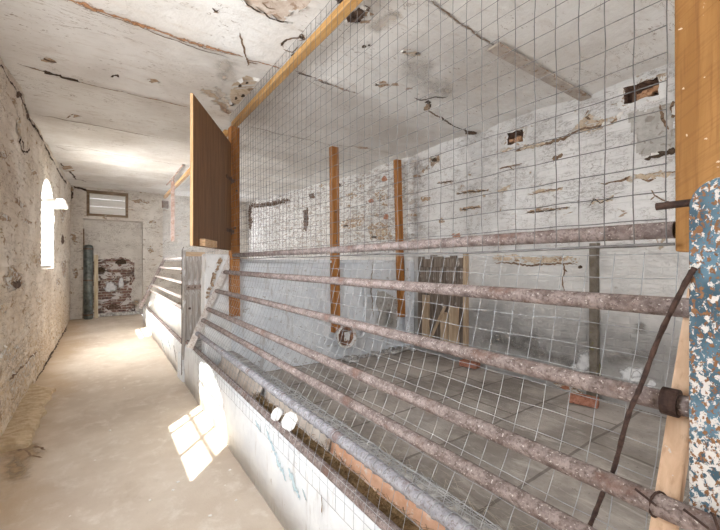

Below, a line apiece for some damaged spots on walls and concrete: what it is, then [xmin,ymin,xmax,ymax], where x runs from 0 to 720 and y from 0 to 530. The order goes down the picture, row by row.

peeling [242,0,311,24]
crack [239,34,249,66]
peeling [229,76,260,108]
crack [415,96,477,135]
spalling [570,73,667,135]
crack [0,64,176,201]
spalling [500,126,528,152]
spalling [248,199,291,230]
peeling [493,254,582,269]
flaking render [93,257,135,314]